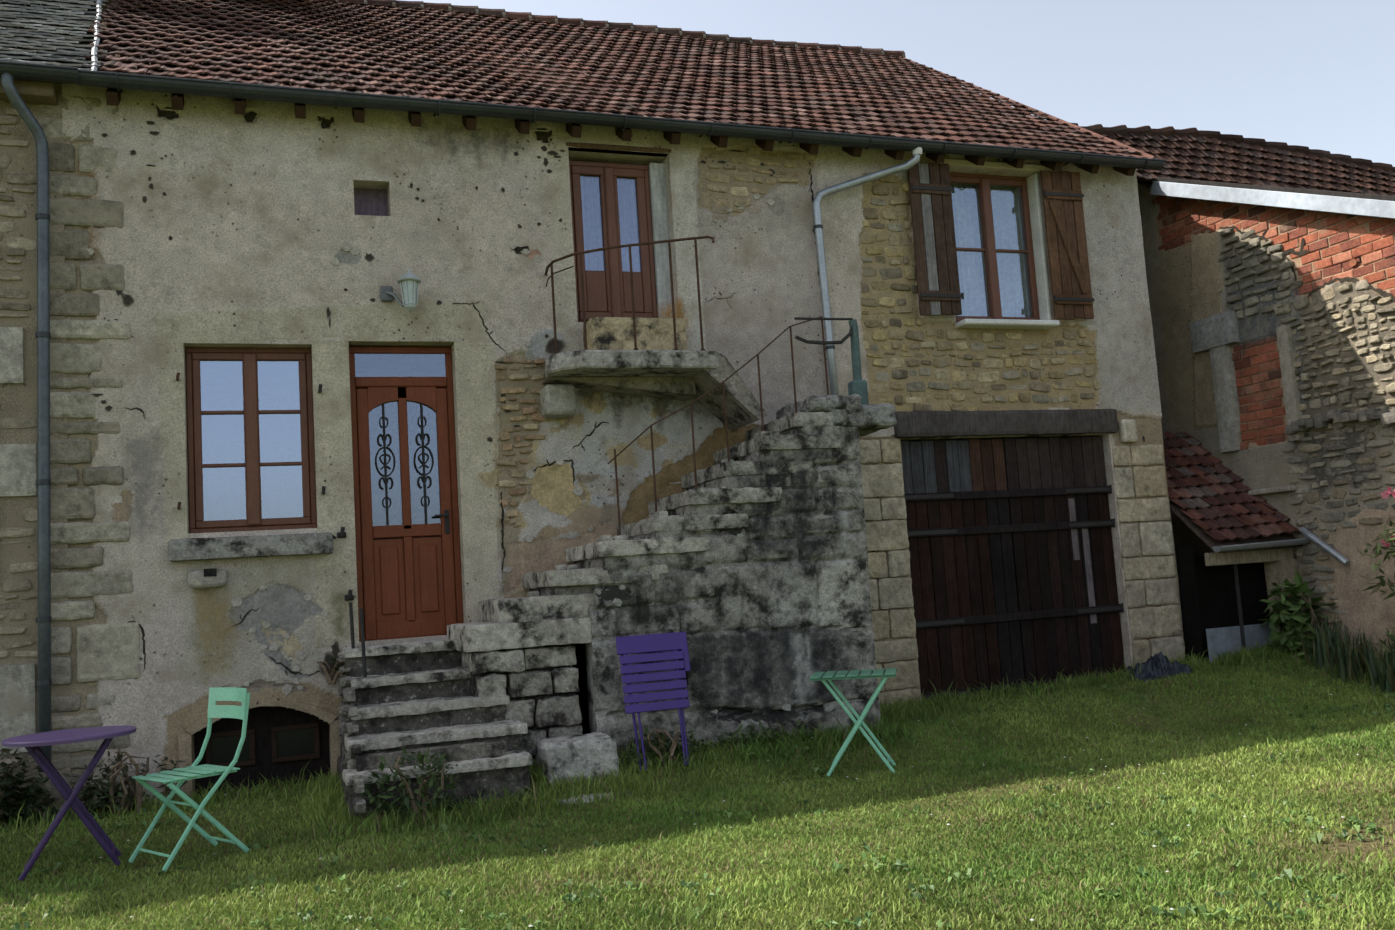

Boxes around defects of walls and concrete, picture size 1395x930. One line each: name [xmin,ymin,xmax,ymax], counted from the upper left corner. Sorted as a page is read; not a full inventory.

crack [453,301,507,353]
flaking render [526,458,584,520]
flaking render [622,423,760,525]
spalling [720,510,744,538]
flaking render [222,582,340,695]